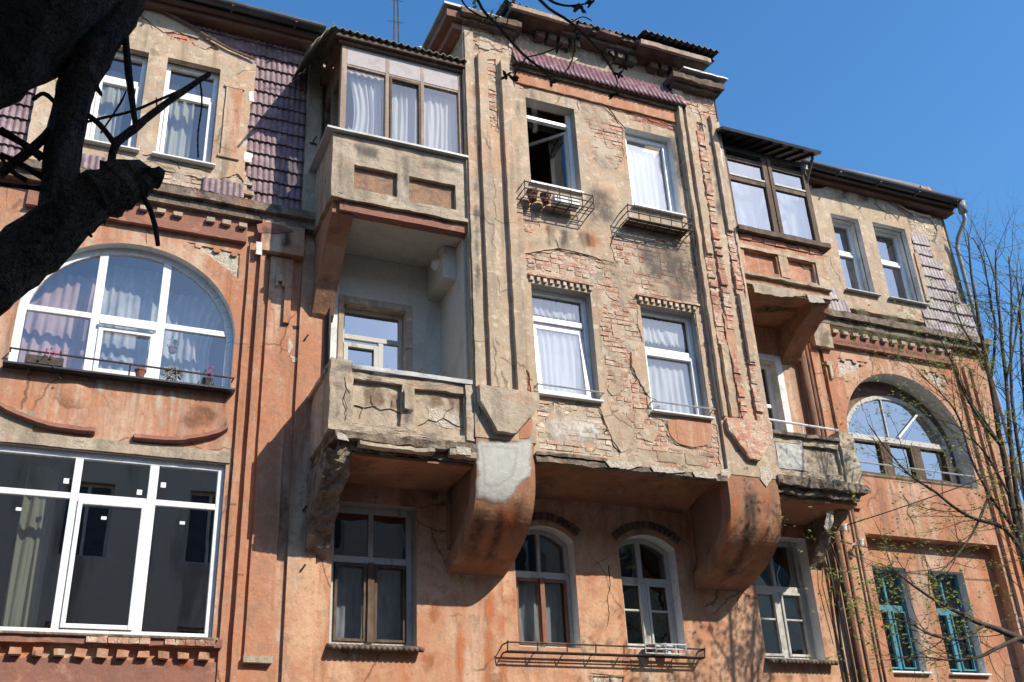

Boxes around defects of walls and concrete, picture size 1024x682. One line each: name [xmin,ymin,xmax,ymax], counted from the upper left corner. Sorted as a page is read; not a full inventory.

spalling [470,29,532,133]
spalling [162,151,254,197]
spalling [578,100,676,207]
spalling [682,92,723,165]
spalling [189,243,240,278]
spalling [520,180,825,482]
crack [344,377,481,428]
peeling [759,465,773,487]